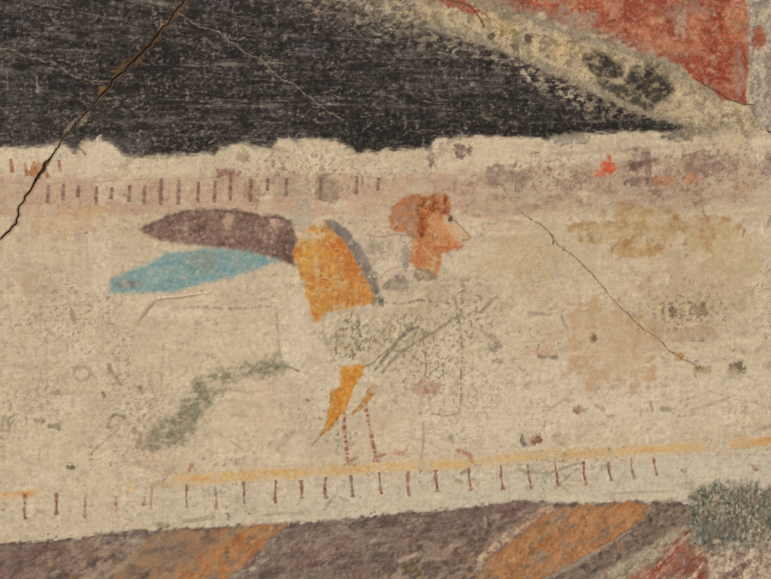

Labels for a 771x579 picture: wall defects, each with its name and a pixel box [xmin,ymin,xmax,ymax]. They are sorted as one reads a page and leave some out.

crack [0,0,344,243]
crack [695,78,755,106]
crack [492,179,696,366]